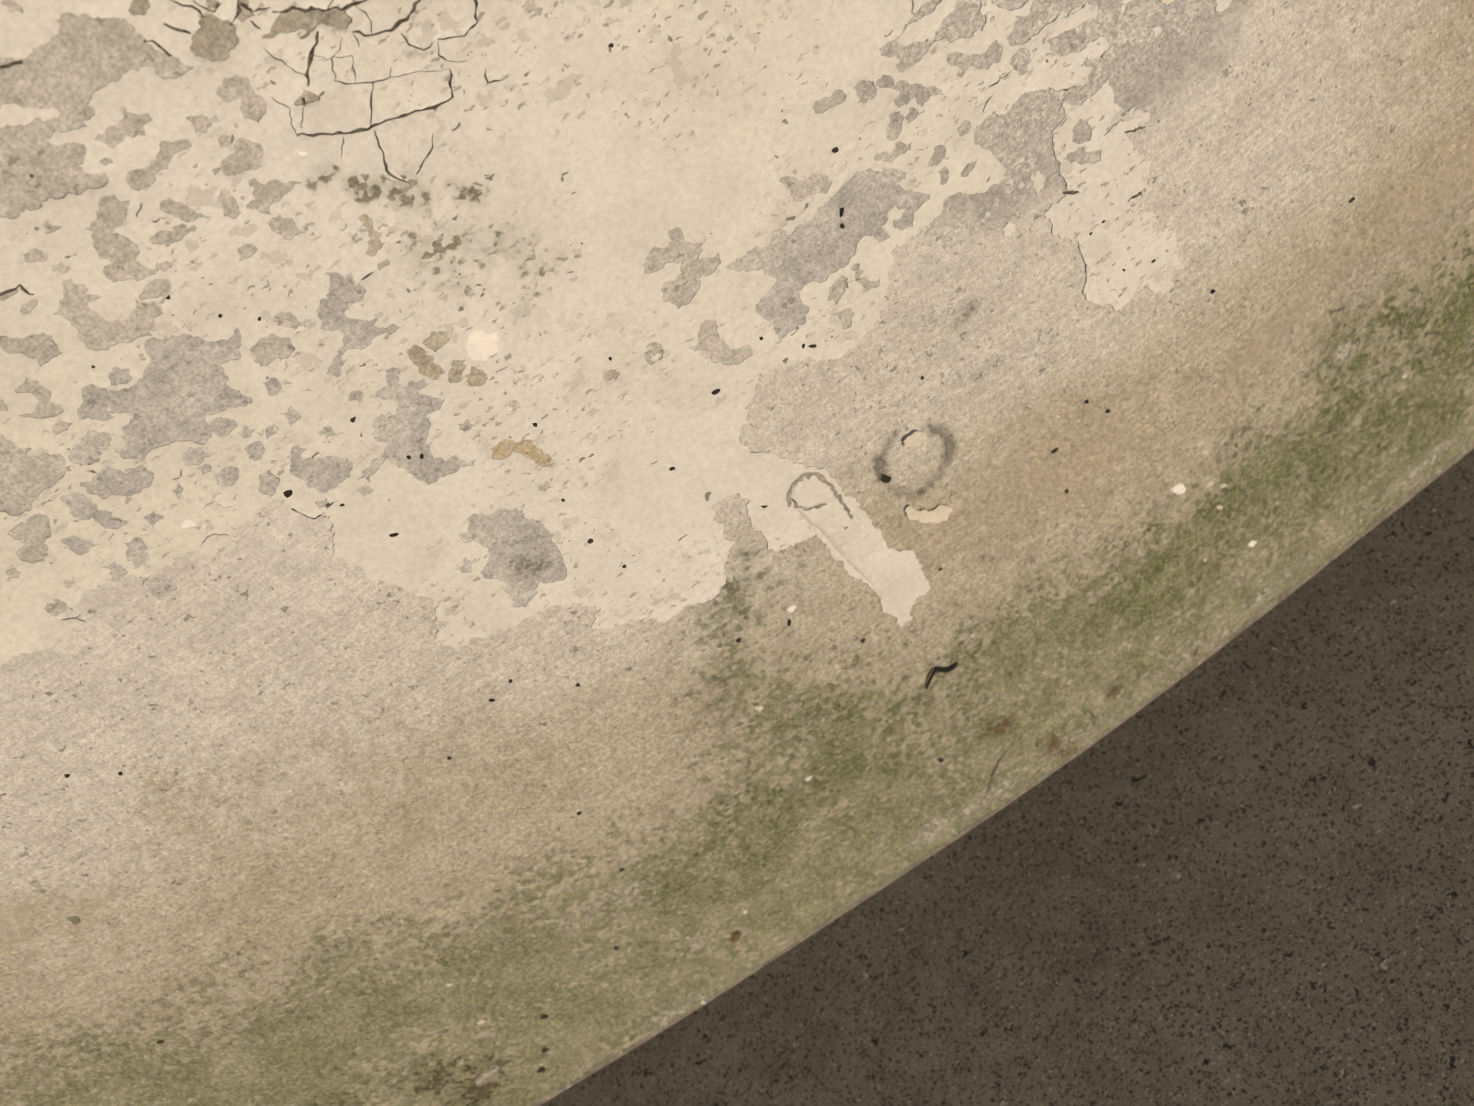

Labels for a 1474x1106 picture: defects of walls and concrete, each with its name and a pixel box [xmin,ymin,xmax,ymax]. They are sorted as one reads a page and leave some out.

crack [143,0,502,188]
peeling [642,0,1232,365]
peeling [0,0,567,607]
peeling [603,357,620,381]
damp [1333,341,1362,365]
peeling [903,431,927,447]
peeling [905,505,953,524]
peeling [44,577,76,616]
damp [911,768,1019,846]
damp [476,1065,499,1085]